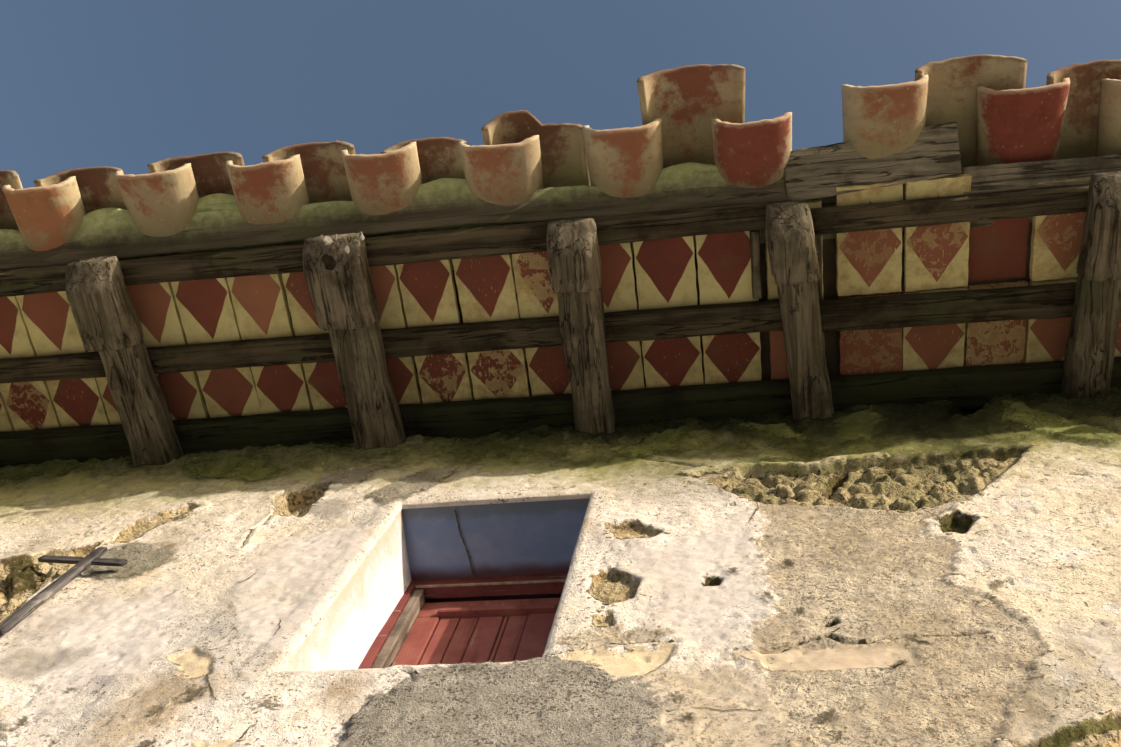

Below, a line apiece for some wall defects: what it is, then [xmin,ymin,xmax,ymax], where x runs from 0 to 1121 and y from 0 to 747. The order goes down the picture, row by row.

flaking render [0,500,199,623]
flaking render [269,483,328,517]
crack [454,510,475,578]
flaking render [557,565,678,679]
flaking render [603,518,671,540]
crack [764,627,940,654]
flaking render [685,443,1121,747]
flaking render [670,691,694,721]